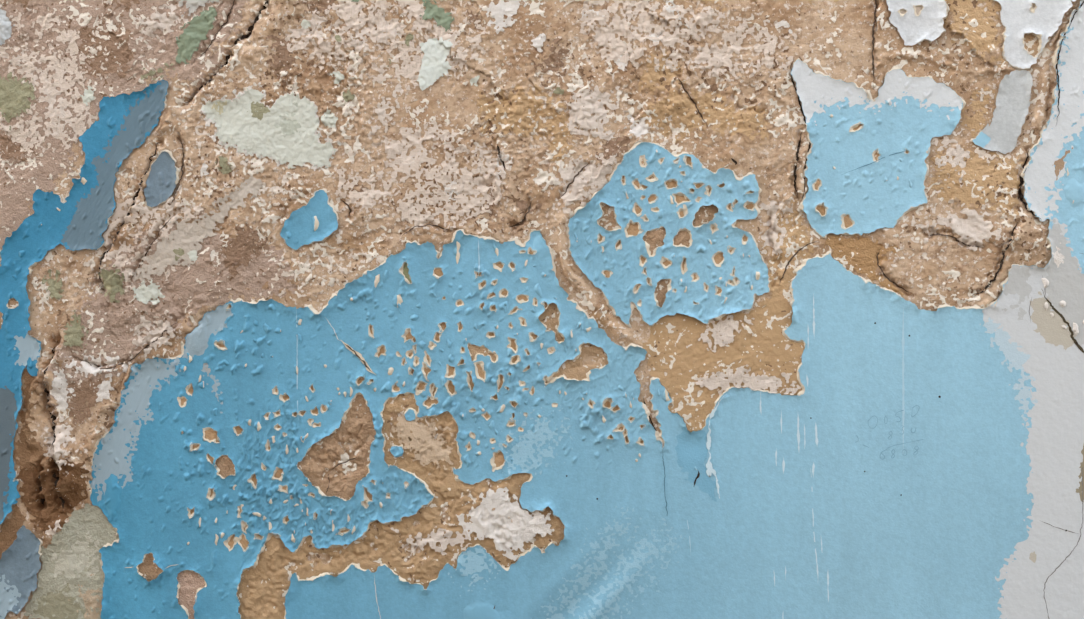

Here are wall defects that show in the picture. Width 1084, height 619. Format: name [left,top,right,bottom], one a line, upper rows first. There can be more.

crack [186,0,268,103]
spalling [627,23,729,115]
crack [99,137,184,290]
peeling [741,0,1076,297]
peeling [0,1,253,619]
spalling [223,0,608,619]
peeling [563,139,804,502]
crack [1029,289,1084,353]
crack [1039,467,1083,618]